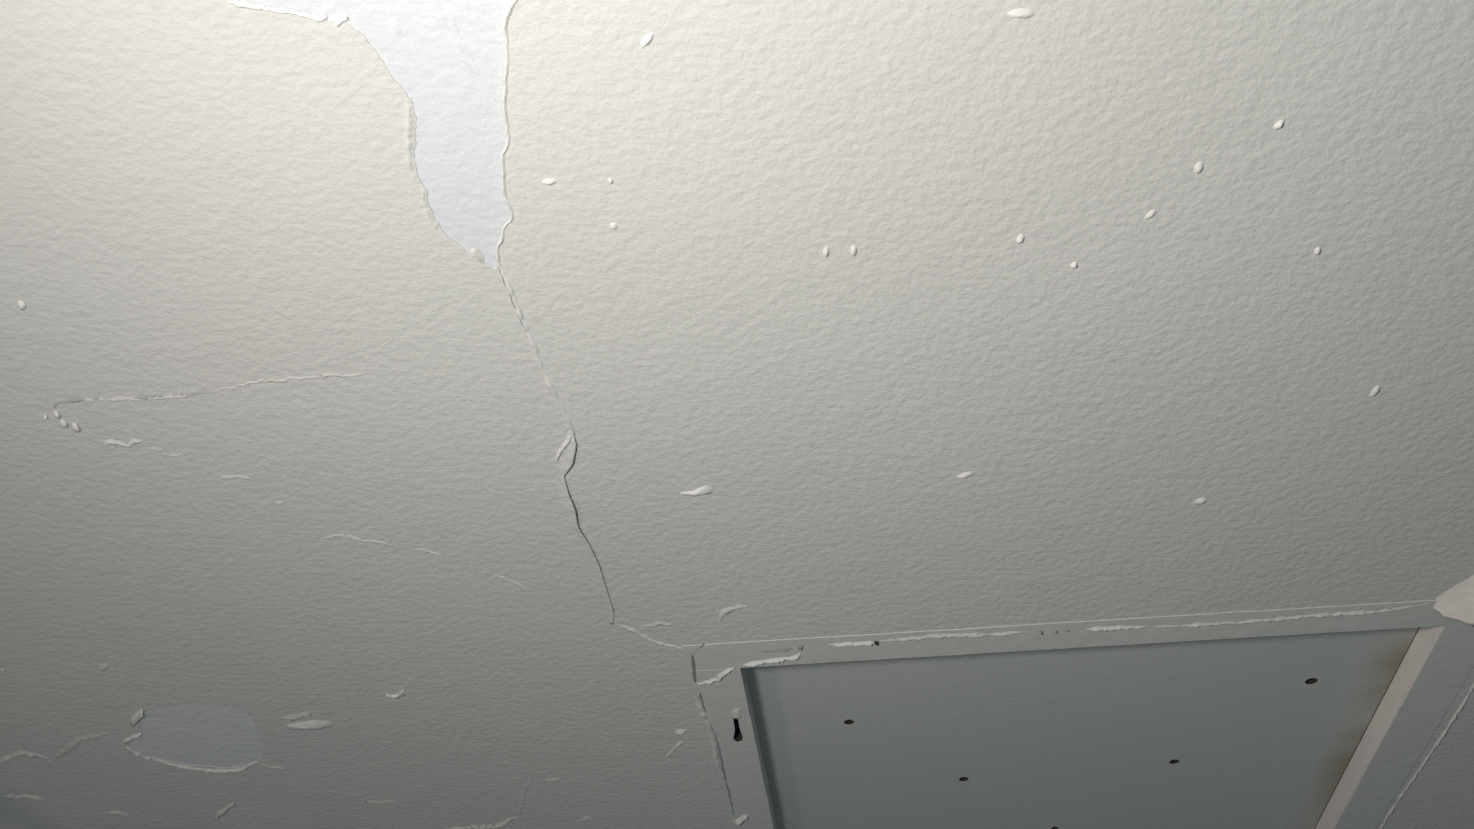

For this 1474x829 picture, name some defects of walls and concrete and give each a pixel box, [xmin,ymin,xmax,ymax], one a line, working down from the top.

peeling [227,0,519,269]
peeling [1433,575,1474,627]